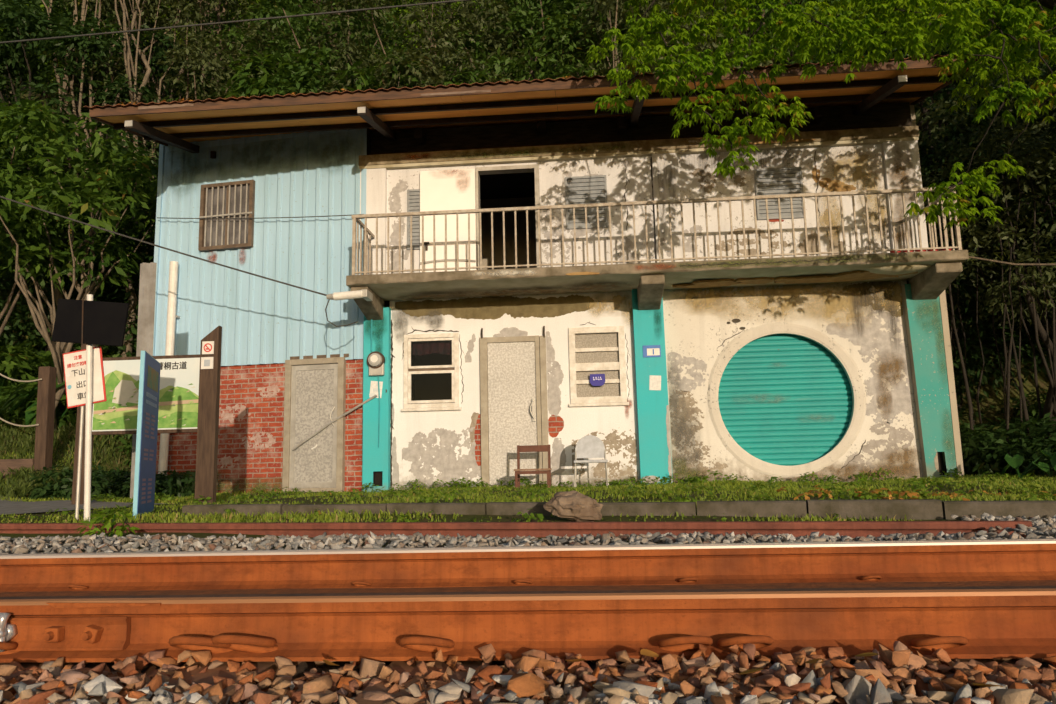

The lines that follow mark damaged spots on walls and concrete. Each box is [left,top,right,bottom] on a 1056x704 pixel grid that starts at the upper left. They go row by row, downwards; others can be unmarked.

peeling [388,179,410,274]
peeling [692,168,746,193]
peeling [715,209,844,256]
leakage [833,154,886,229]
leakage [890,149,913,248]
flaking render [395,294,595,337]
efflorescence [219,404,253,423]
leakage [217,431,276,478]
peeling [386,389,481,489]
peeling [546,331,728,484]
leakage [668,377,704,482]
leakage [808,450,914,482]